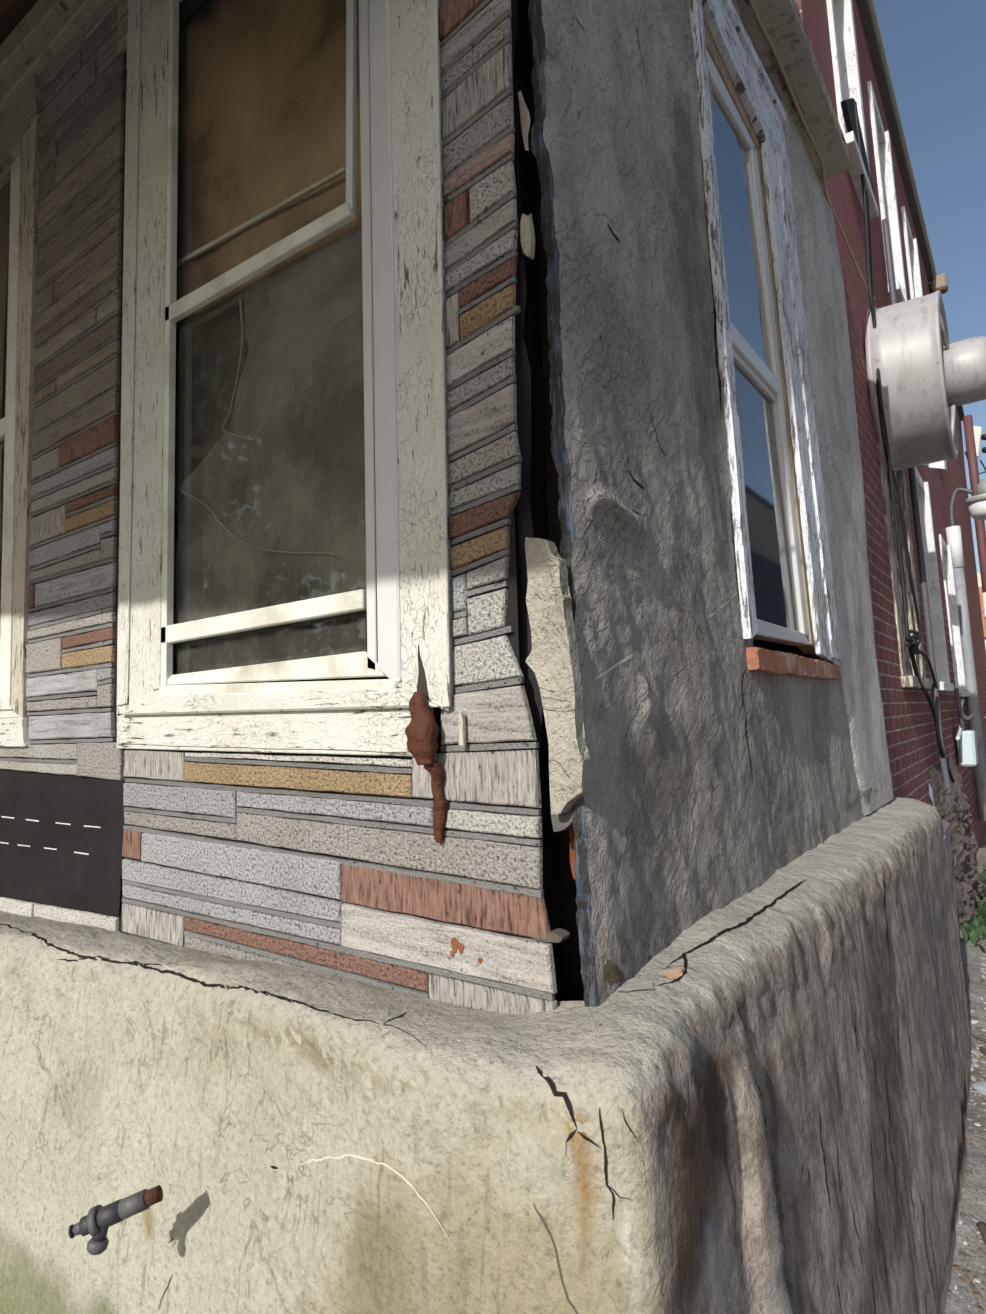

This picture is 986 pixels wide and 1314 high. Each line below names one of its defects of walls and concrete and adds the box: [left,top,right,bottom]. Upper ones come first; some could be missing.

corrosion [405,691,449,843]
crack [1,924,430,1050]
crack [657,879,806,986]
corrosion [570,1118,588,1227]
crack [536,1065,637,1218]
leakage [667,1051,735,1314]
leakage [746,1041,794,1314]
leakage [951,1087,967,1231]
leakage [0,1259,65,1314]
crack [533,1204,578,1314]